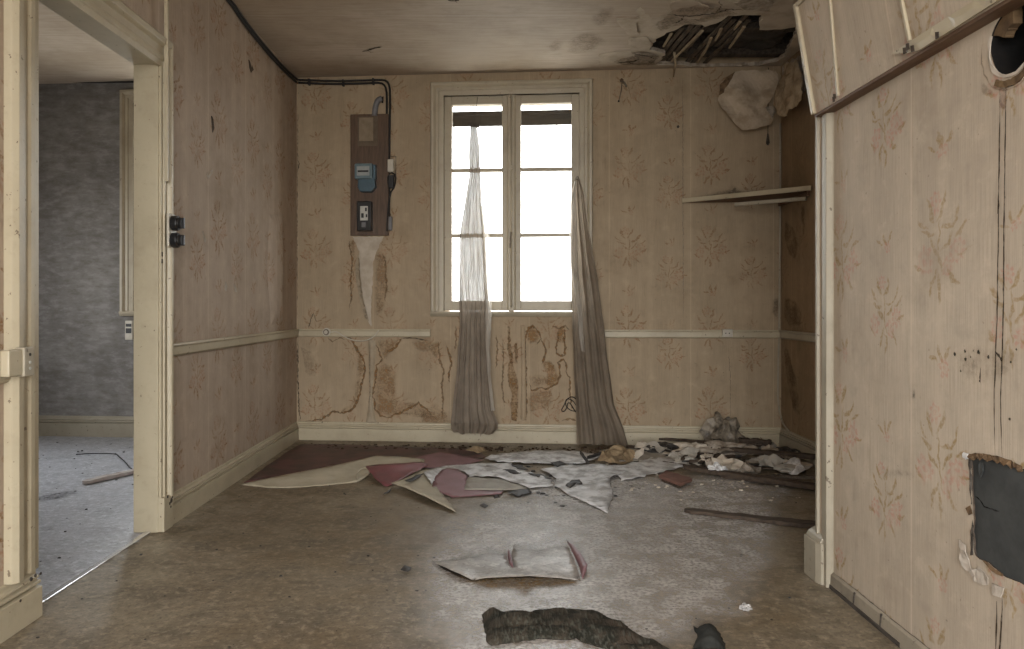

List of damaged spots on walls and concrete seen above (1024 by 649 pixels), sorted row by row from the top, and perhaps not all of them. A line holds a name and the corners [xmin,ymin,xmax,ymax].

spalling [598,0,807,94]
flaking render [353,236,383,326]
leakage [313,330,457,422]
leakage [525,325,572,415]
spalling [959,452,1024,598]